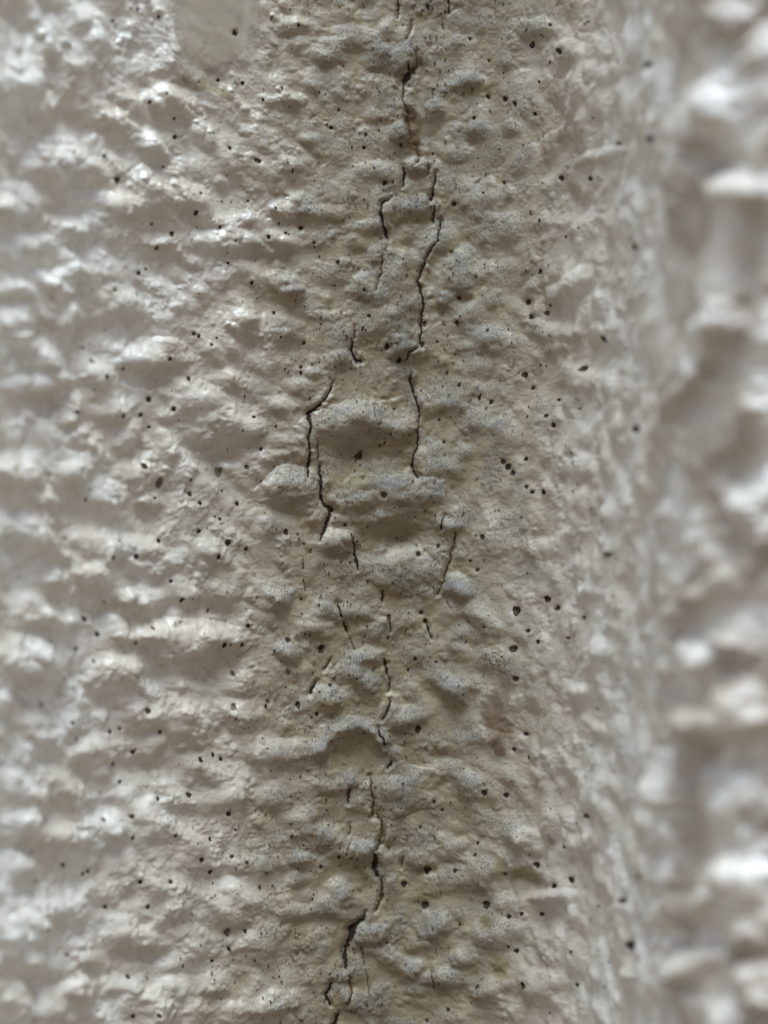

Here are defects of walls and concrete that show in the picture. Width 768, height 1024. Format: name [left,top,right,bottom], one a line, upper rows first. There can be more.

crack [375,0,450,478]
crack [350,327,362,363]
crack [302,383,359,592]
crack [437,510,465,609]
crack [309,604,354,694]
crack [381,590,432,639]
crack [324,657,404,1024]